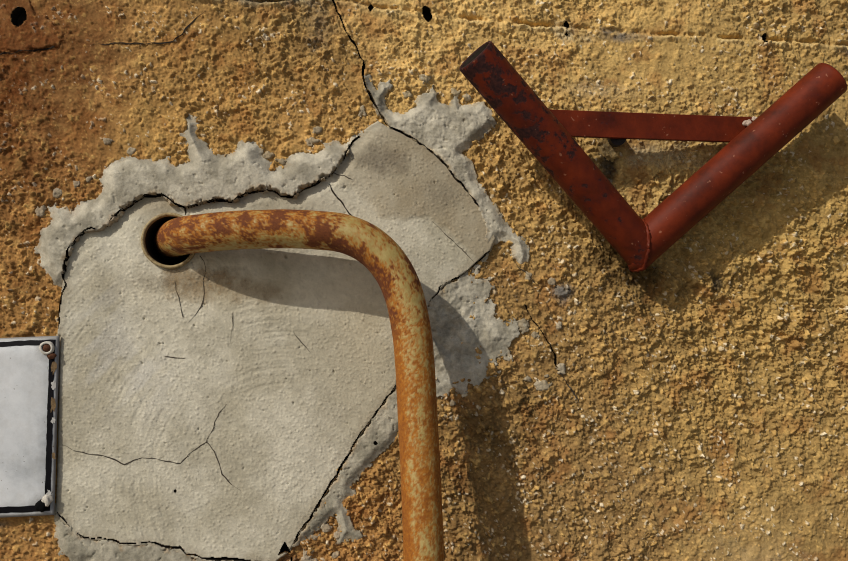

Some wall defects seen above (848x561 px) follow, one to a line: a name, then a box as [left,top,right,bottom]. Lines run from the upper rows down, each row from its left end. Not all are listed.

crack [0,46,54,55]
crack [102,12,204,45]
crack [332,0,479,206]
peeling [34,114,372,288]
peeling [363,74,530,399]
crack [429,222,490,302]
crack [525,304,579,403]
crack [63,404,238,489]
peeling [278,387,398,560]
crack [286,385,396,561]
peeling [46,490,226,561]
crack [57,512,256,561]